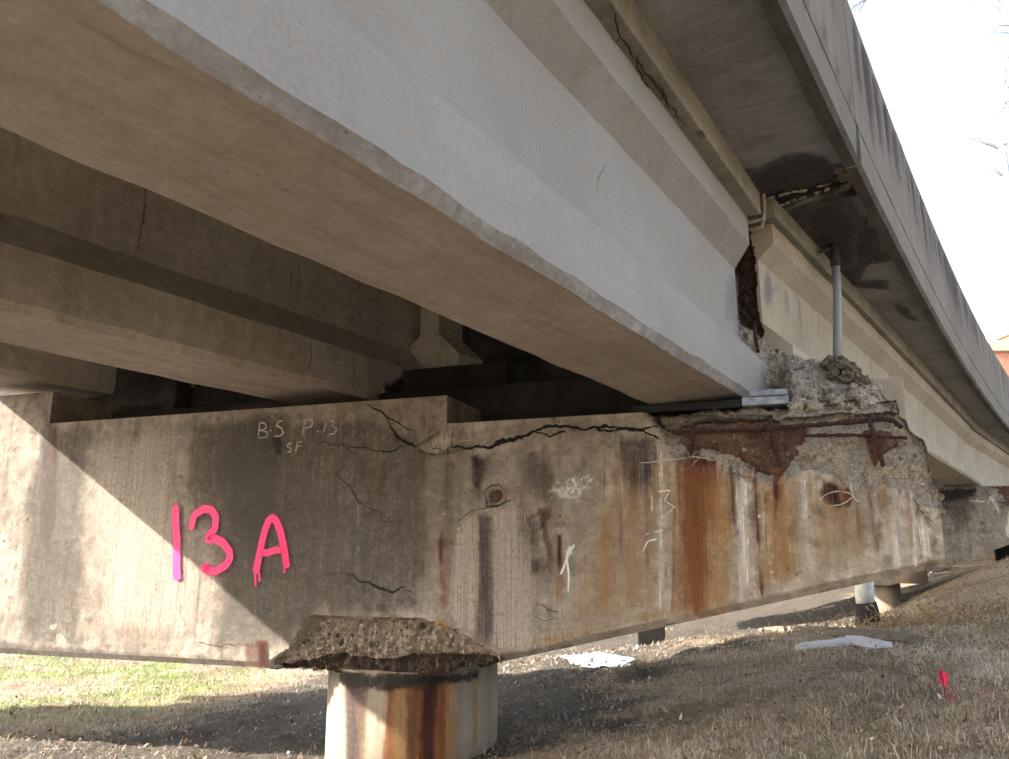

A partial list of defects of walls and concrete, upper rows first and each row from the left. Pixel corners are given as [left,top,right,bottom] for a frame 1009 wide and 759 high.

crack [610,2,686,127]
damp [745,154,890,290]
crack [313,354,665,455]
spalling [653,271,947,513]
crack [321,572,415,595]
spalling [264,484,644,677]
crack [456,499,515,523]
corrosion [538,507,563,602]
corrosion [667,454,735,616]
corrosion [821,481,852,508]
corrosion [344,674,369,759]
corrosion [383,675,456,759]